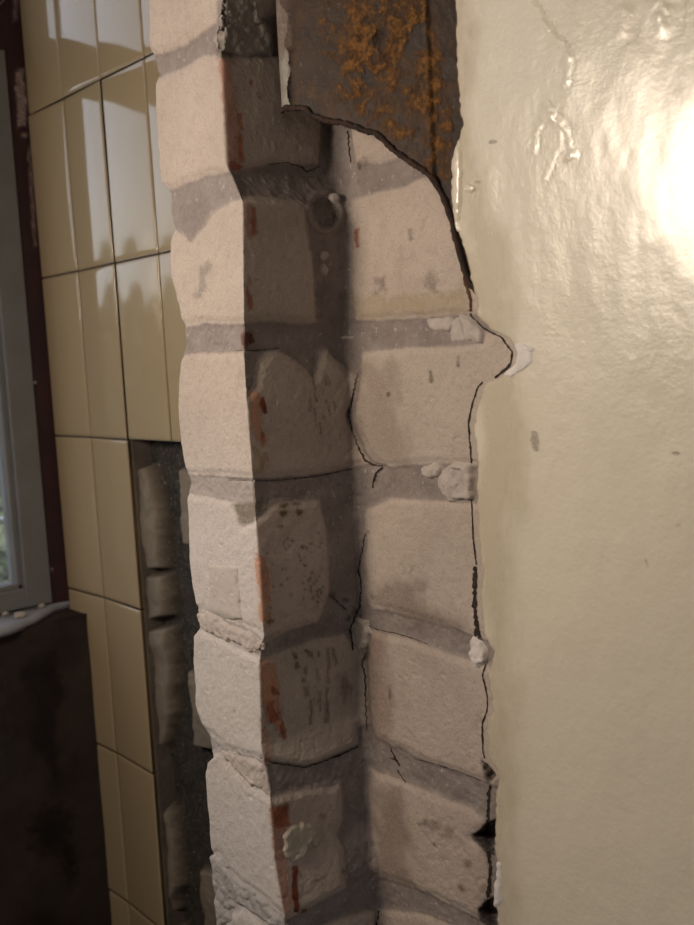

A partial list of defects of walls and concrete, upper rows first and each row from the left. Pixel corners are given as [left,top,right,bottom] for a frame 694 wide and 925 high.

peeling [276,0,290,107]
rust [320,0,452,177]
peeling [138,440,288,925]
flaking render [332,124,535,925]